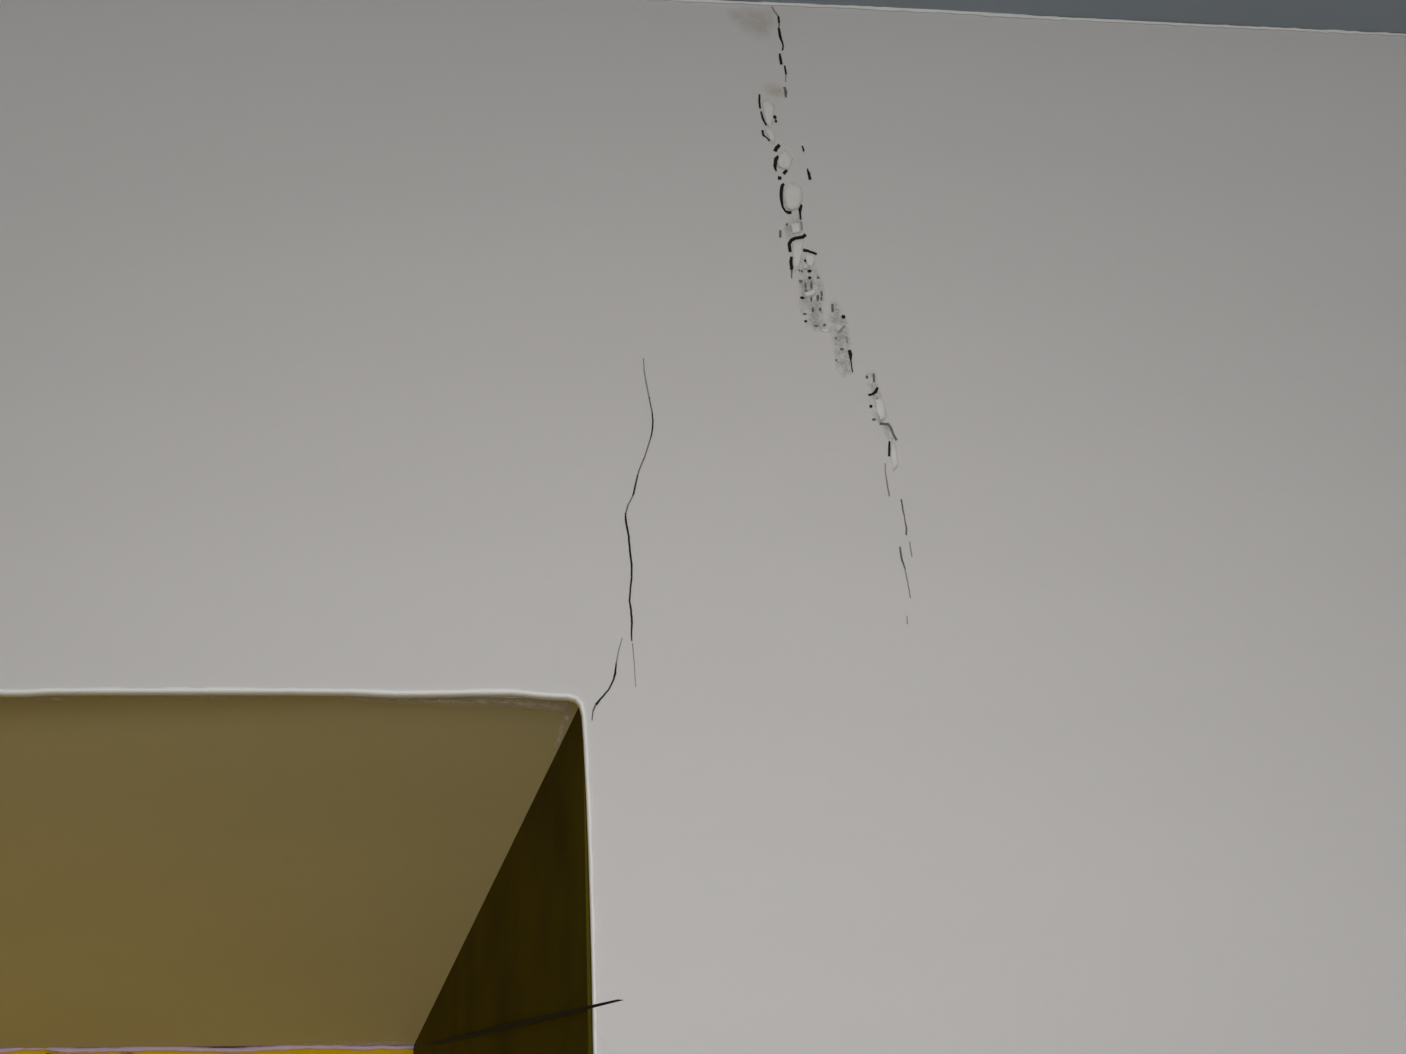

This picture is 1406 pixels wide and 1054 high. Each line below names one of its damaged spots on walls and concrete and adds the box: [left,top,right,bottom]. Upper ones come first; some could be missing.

crack [758,6,817,278]
crack [592,358,654,720]
crack [831,304,913,624]